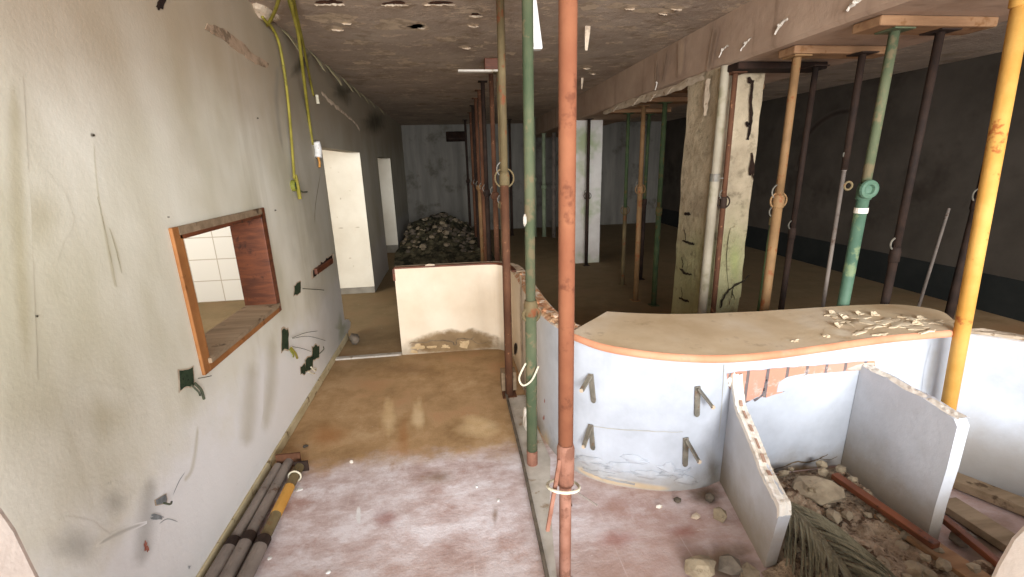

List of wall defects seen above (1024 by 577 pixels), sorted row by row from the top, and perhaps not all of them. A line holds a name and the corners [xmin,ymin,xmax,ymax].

flaking render [205,23,269,68]
peeling [305,0,471,50]
crack [679,230,694,303]
crack [720,275,749,308]
water stain [365,326,504,380]
flaking render [727,361,968,518]